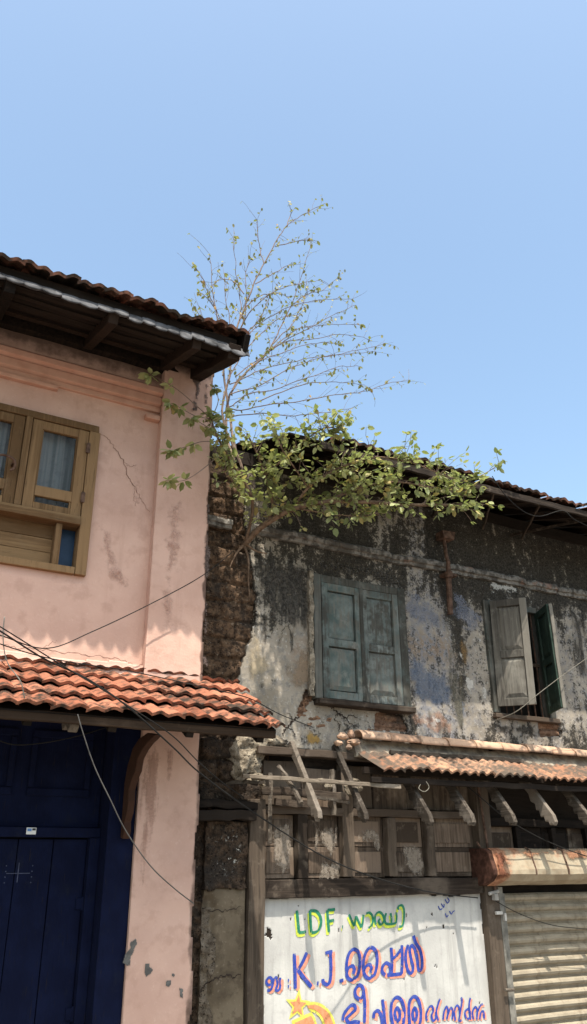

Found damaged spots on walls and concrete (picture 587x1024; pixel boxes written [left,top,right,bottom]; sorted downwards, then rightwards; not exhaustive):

crack [105,436,150,512]
leakage [260,556,308,650]
spalling [296,690,333,729]
spalling [366,712,450,734]
leakage [449,657,465,726]
spalling [538,723,559,737]
spalling [226,736,288,781]
spalling [123,939,137,966]